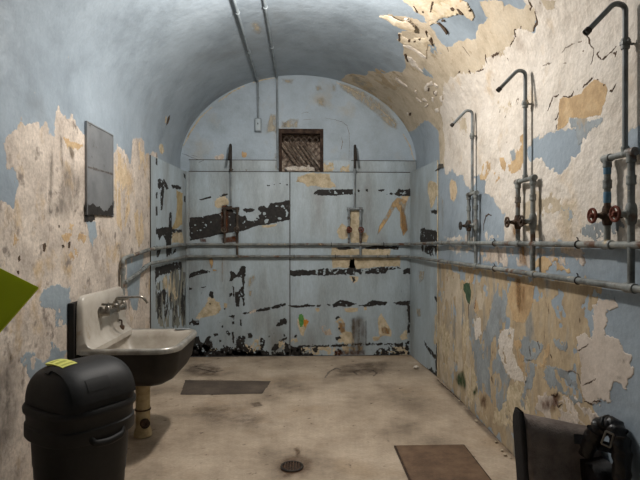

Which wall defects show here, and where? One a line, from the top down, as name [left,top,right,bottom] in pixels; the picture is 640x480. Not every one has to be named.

peeling [0,105,421,480]
peeling [338,0,640,456]